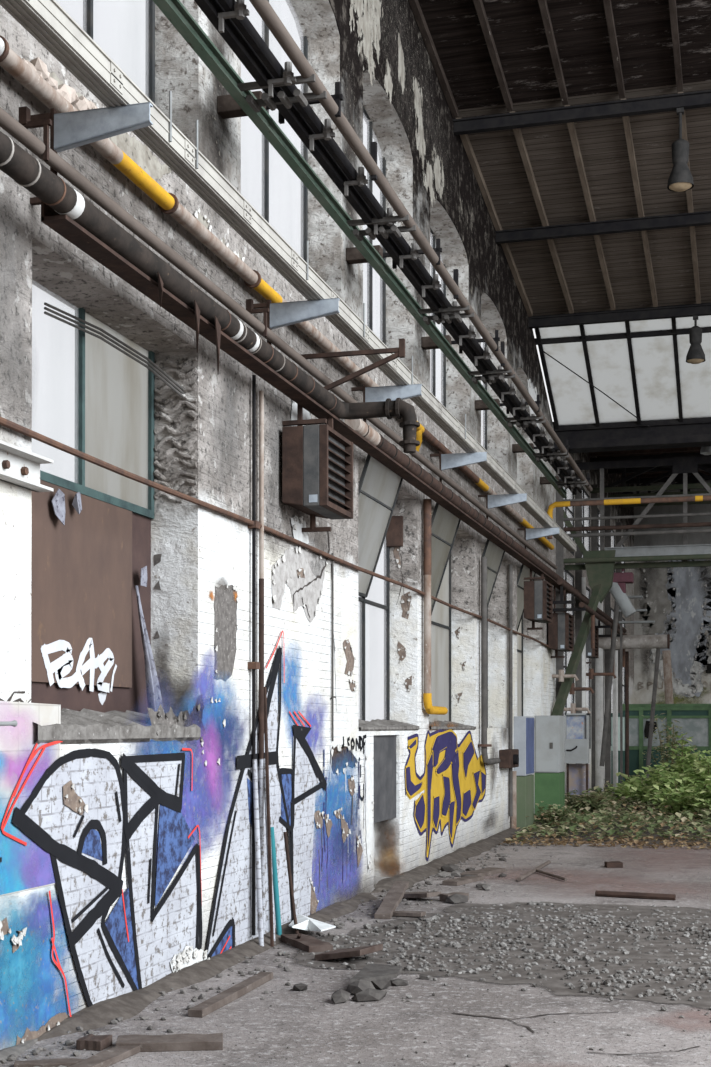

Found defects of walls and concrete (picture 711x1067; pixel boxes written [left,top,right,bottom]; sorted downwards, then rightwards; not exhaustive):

peeling [349,0,444,211]
peeling [272,515,328,622]
flaking render [214,584,239,681]
peeling [636,559,711,697]
peeling [63,781,88,815]
peeling [0,917,27,953]